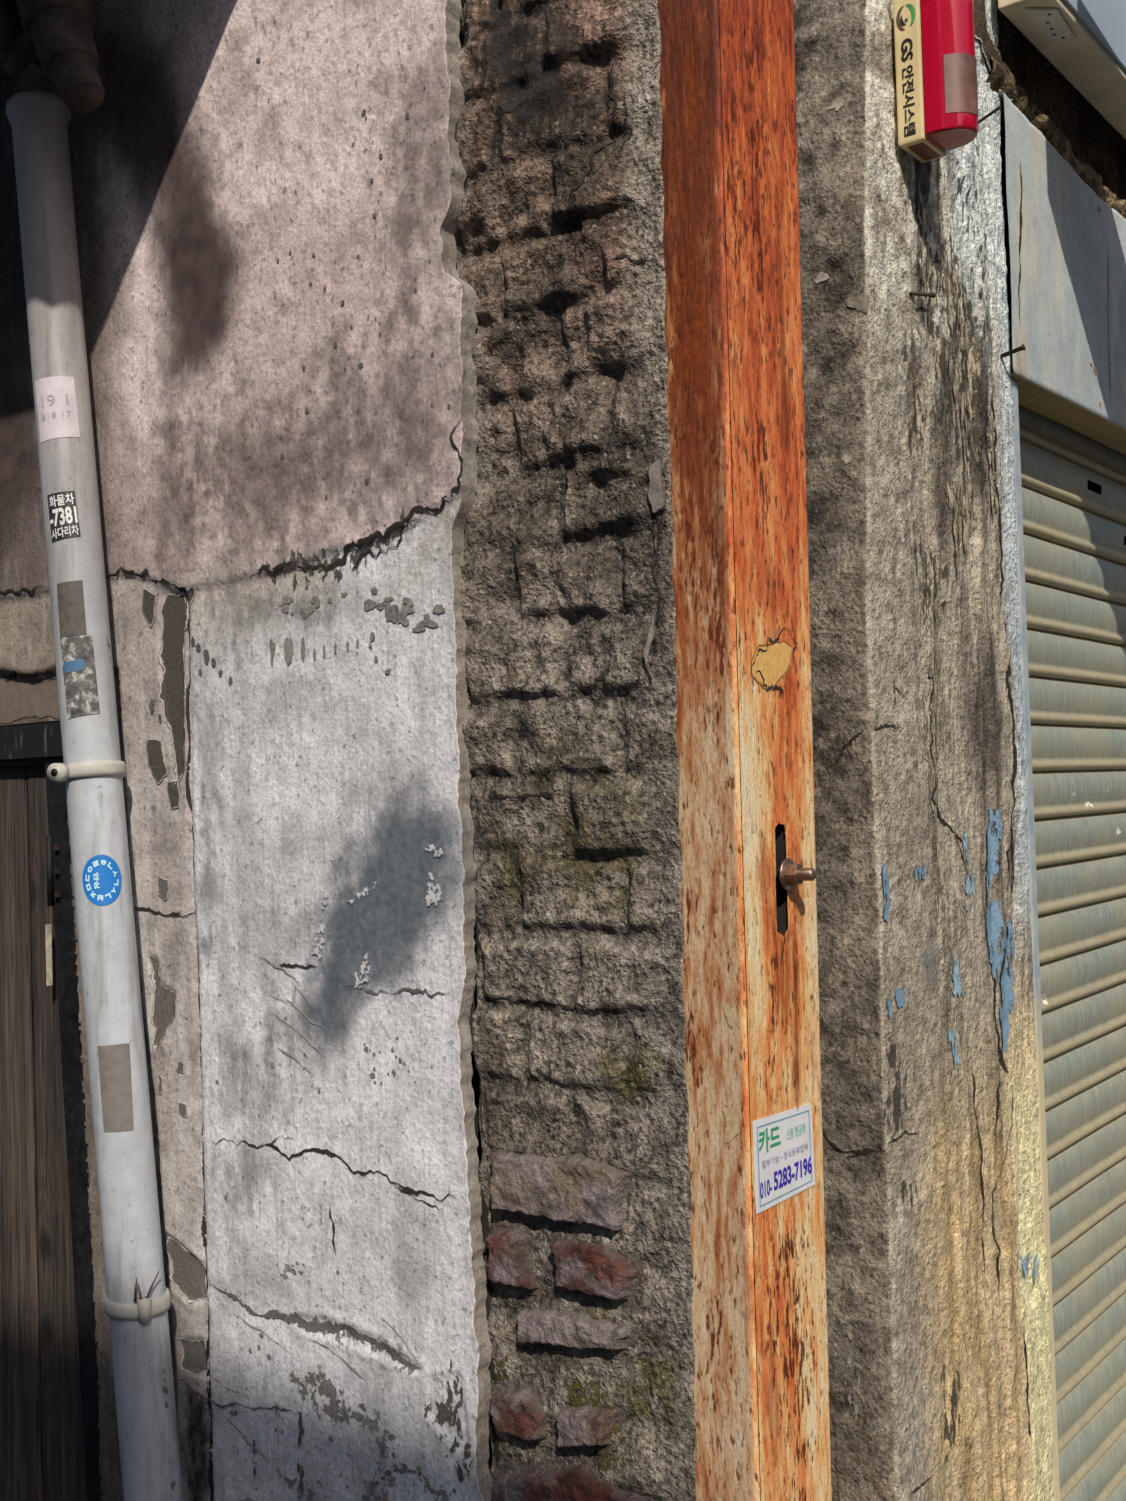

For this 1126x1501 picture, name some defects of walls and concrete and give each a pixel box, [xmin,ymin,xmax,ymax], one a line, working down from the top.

damp [97,33,229,372]
damp [902,160,993,499]
peeling [141,586,233,809]
crack [250,414,463,590]
peeling [270,586,445,674]
damp [904,523,950,648]
crack [106,567,493,1501]
damp [310,983,350,1042]
crack [276,920,618,1134]
spalling [485,1147,644,1359]
peeling [290,1360,473,1501]
crack [488,1355,500,1480]